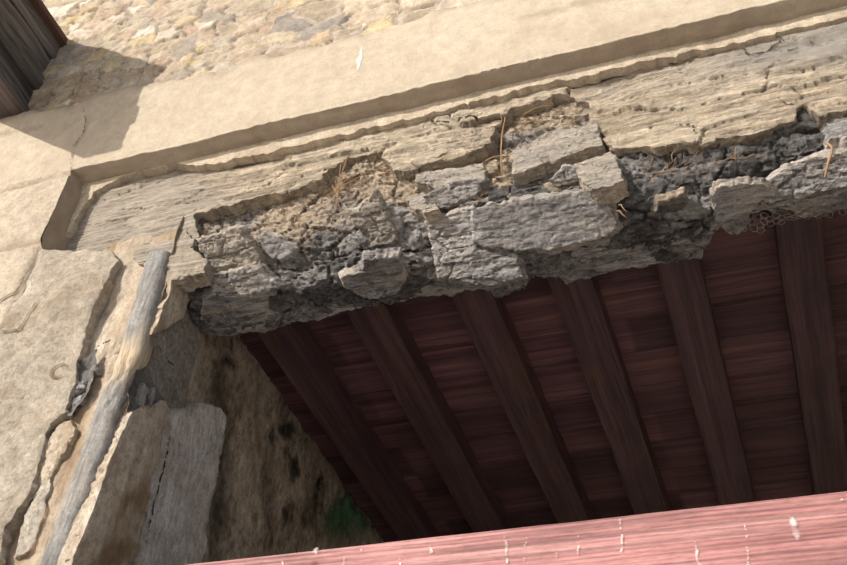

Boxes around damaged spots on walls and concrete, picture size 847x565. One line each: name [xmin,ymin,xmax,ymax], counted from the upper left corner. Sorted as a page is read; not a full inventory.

crack [738,39,798,56]
peeling [149,117,847,336]
crack [145,436,171,542]